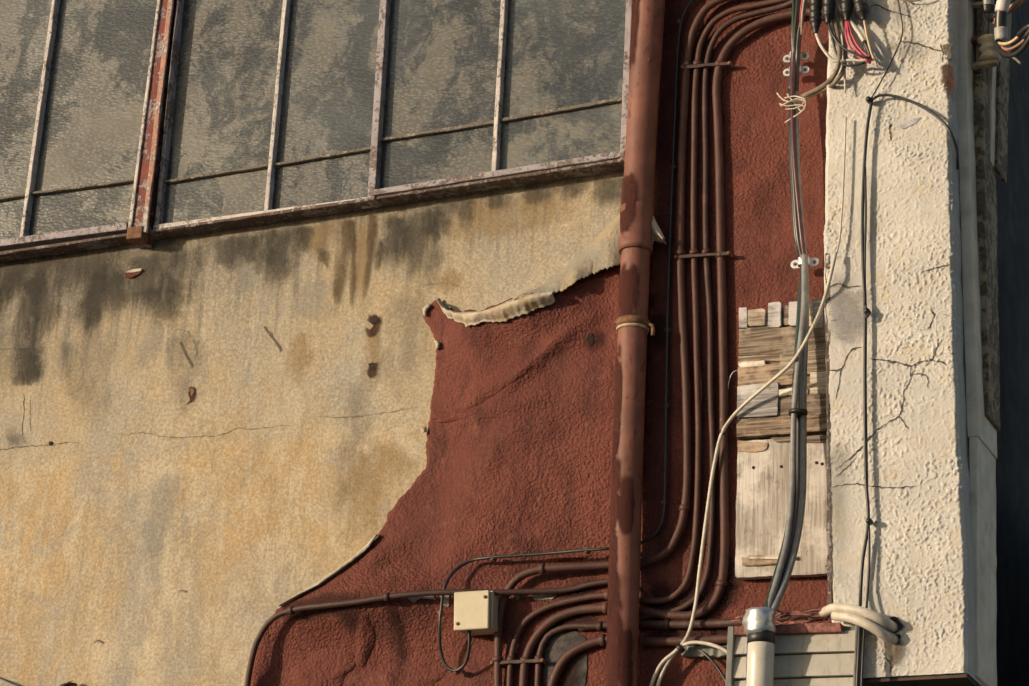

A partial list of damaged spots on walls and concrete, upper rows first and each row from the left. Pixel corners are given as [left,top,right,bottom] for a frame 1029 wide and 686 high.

damp [217,227,310,274]
damp [319,201,470,304]
peeling [652,216,666,245]
damp [0,254,191,384]
rust [365,314,381,337]
peeling [250,213,621,686]
crack [827,310,948,595]